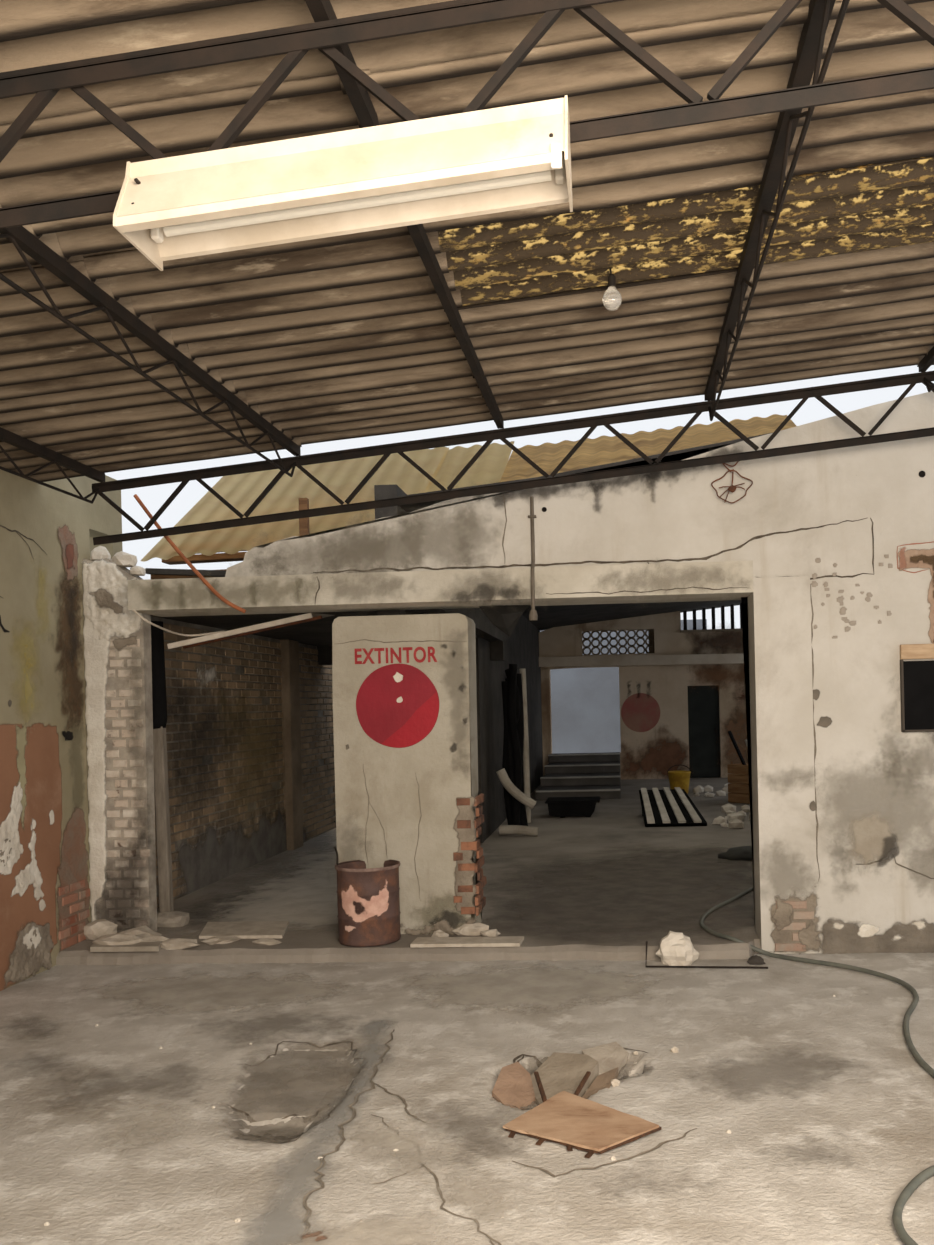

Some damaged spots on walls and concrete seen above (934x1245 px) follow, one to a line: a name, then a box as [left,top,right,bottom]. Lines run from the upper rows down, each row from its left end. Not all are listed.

crack [0,525,45,559]
flaking render [58,525,150,927]
crack [313,495,934,881]
flaking render [0,782,90,988]
flaking render [400,794,487,935]
flaking render [771,894,821,954]
crack [513,1054,537,1063]
crack [227,1029,502,1245]
crack [512,1128,697,1177]